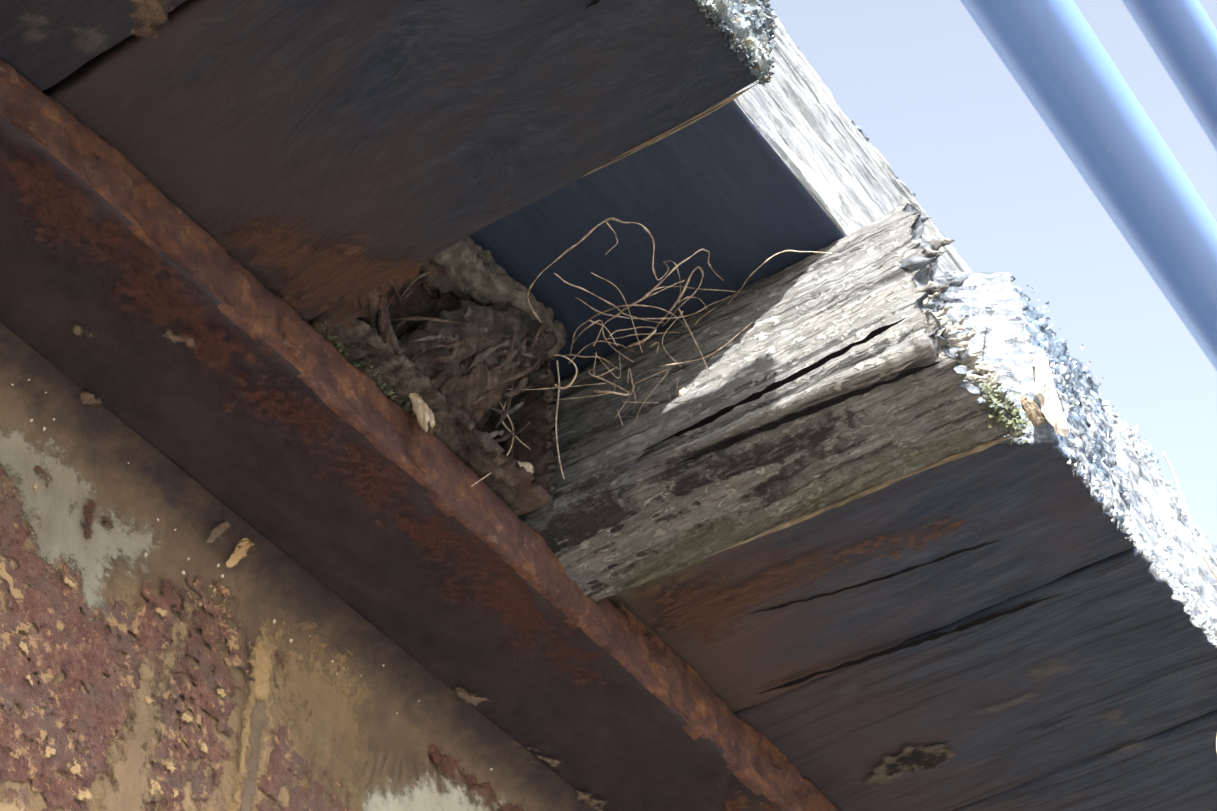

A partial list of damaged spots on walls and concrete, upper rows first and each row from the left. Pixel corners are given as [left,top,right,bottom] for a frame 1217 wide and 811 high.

peeling [80,392,102,405]
crack [643,318,942,466]
peeling [0,429,162,620]
peeling [206,519,233,543]
peeling [226,538,255,568]
crack [749,540,1002,614]
rust [0,465,252,811]
crack [757,592,1065,695]
peeling [0,798,44,811]
rust [254,716,351,811]
rust [428,744,523,811]